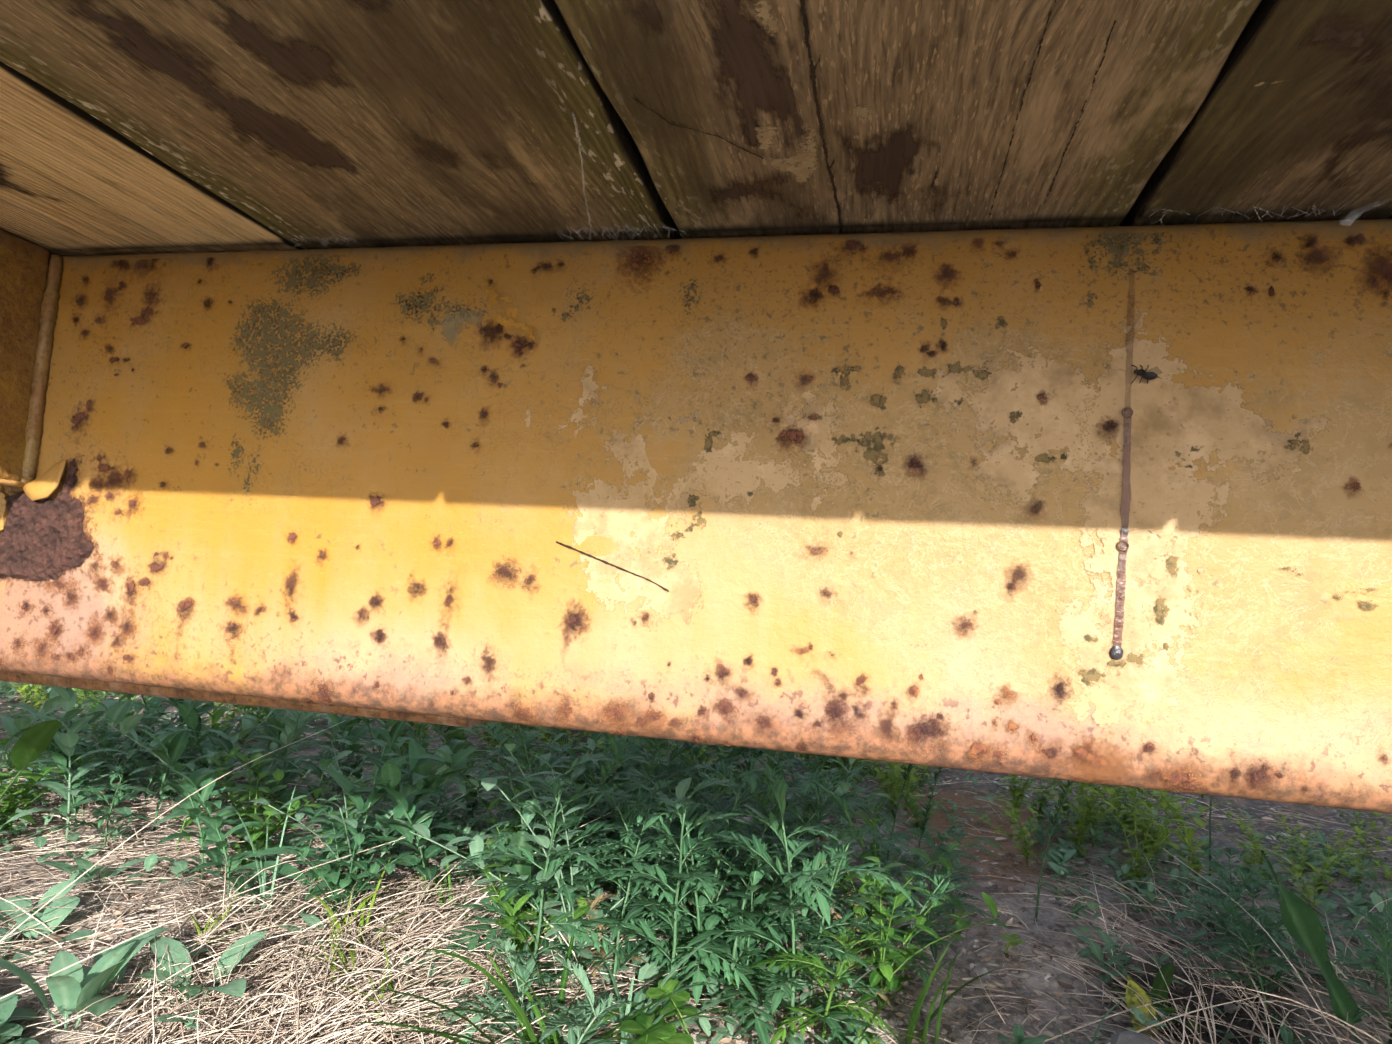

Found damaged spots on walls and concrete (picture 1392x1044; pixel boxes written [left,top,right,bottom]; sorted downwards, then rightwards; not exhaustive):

damp [66,0,357,174]
damp [705,0,806,147]
crack [800,0,843,233]
damp [842,124,923,203]
crack [989,0,1056,215]
crack [1043,20,1116,204]
peeling [554,364,611,441]
peeling [561,383,849,631]
peeling [928,301,1329,733]
rust [358,596,384,642]
rust [698,688,747,715]
rust [796,675,867,727]